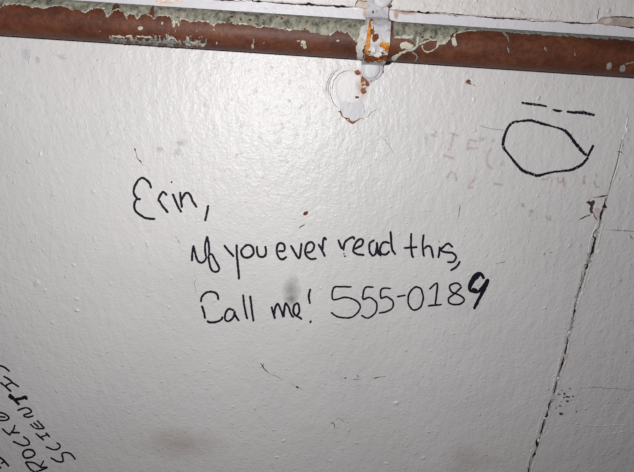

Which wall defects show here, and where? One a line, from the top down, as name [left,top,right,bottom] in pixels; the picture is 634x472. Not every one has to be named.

corrosion [364,11,389,63]
corrosion [355,70,370,99]
peeling [338,101,377,124]
crack [610,113,630,187]
spalling [579,195,608,221]
crack [525,208,634,472]